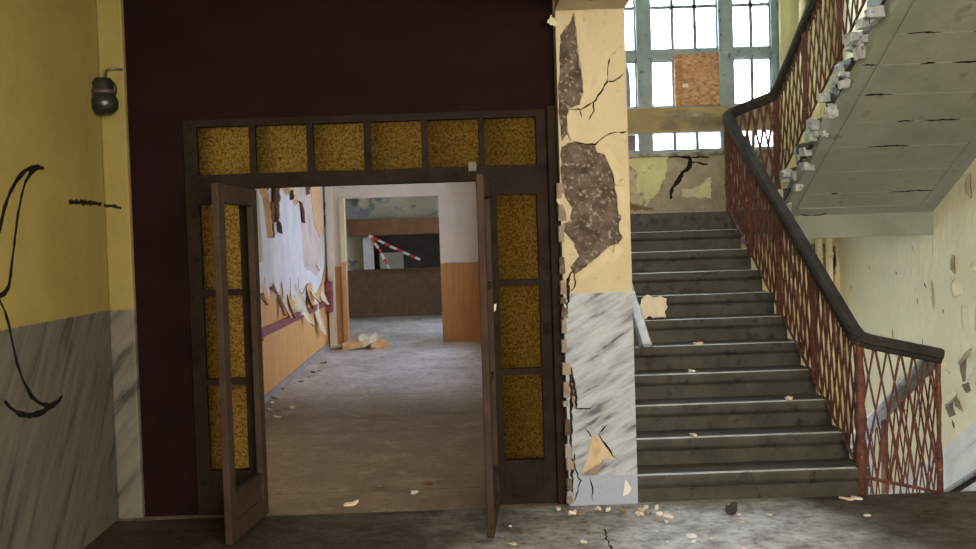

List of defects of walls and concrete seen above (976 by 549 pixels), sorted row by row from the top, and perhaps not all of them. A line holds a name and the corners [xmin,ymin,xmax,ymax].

crack [567,47,628,145]
spalling [778,5,886,211]
flaking render [547,11,668,407]
crack [669,156,709,199]
peeling [681,177,712,198]
peeling [256,187,329,338]
peeling [895,339,976,429]
flaking render [564,419,617,504]